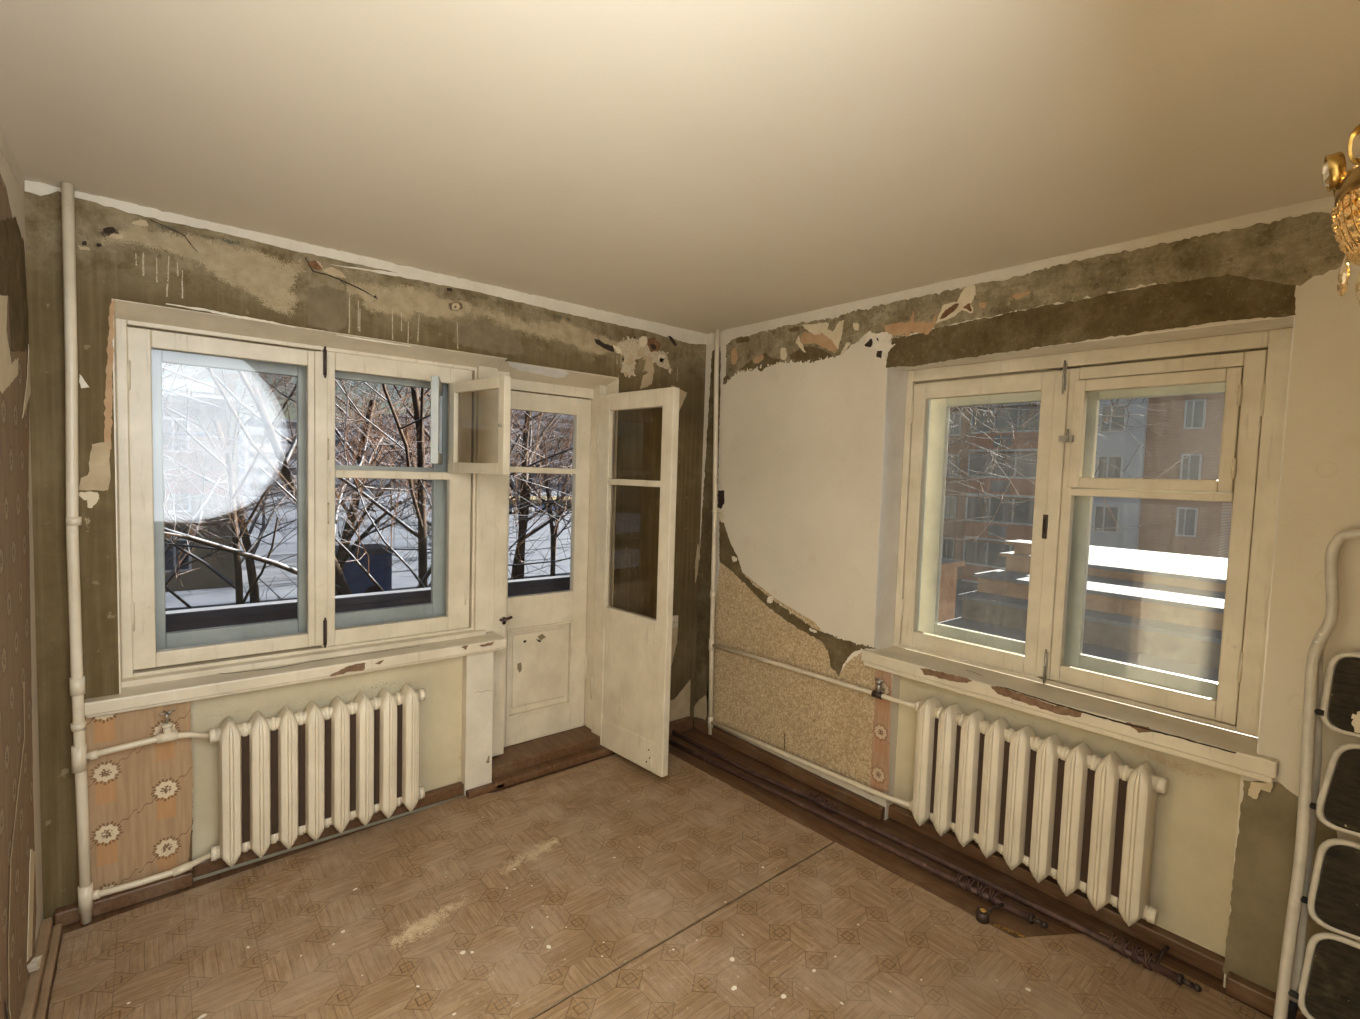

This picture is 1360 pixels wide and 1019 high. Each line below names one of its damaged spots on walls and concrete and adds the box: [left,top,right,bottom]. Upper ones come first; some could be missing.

flaking render [0,217,29,352]
peeling [78,220,677,389]
spalling [723,209,1360,385]